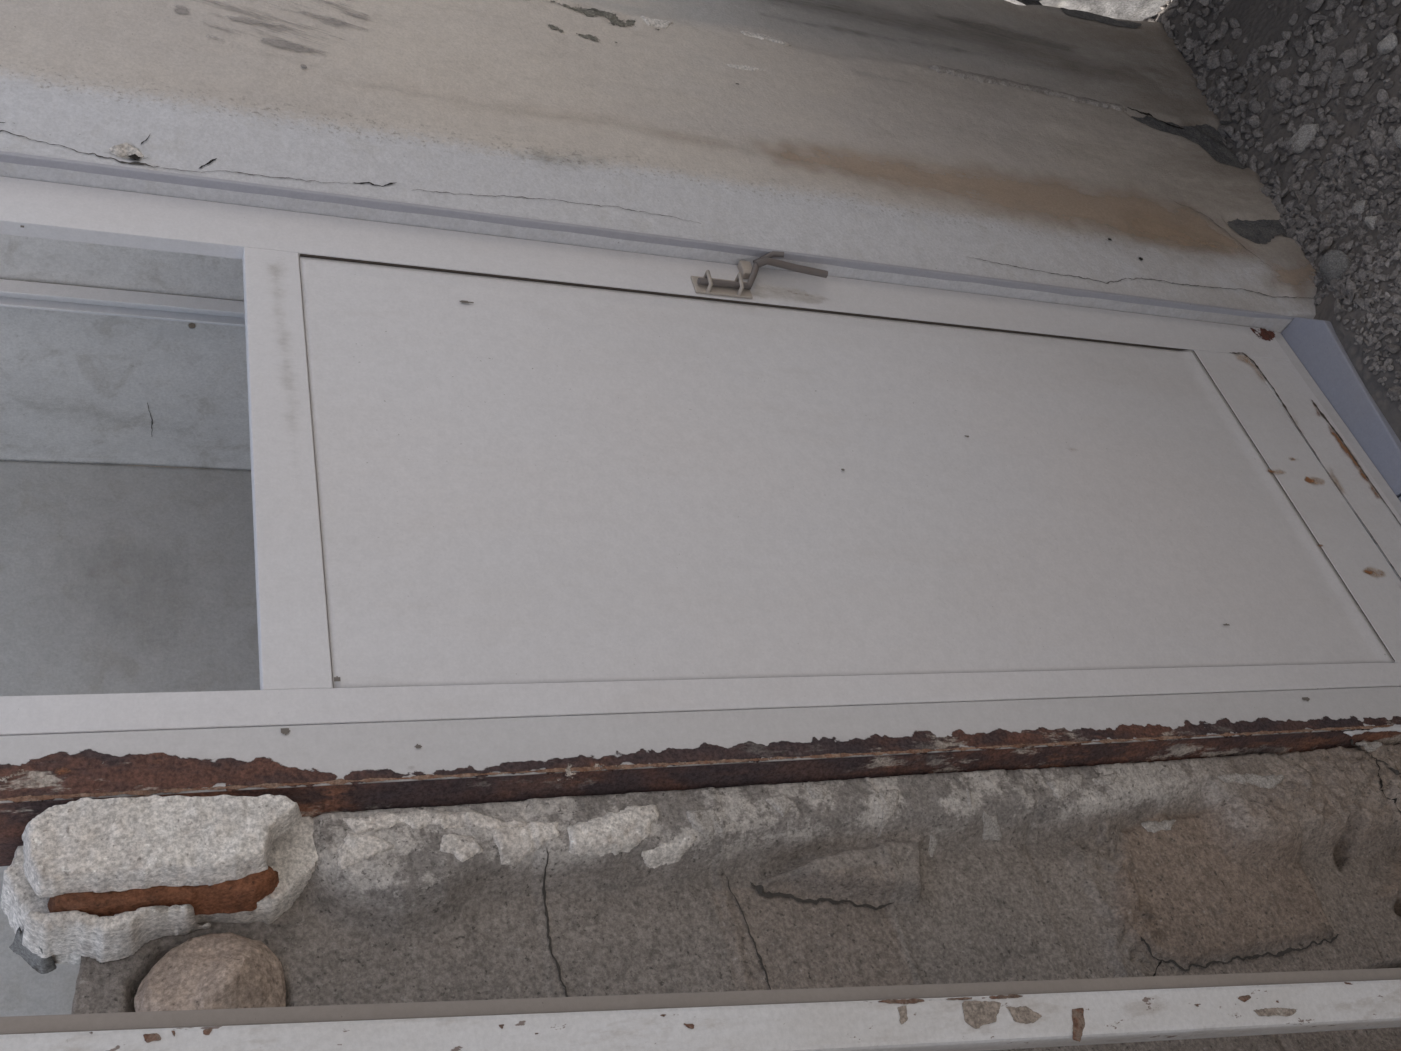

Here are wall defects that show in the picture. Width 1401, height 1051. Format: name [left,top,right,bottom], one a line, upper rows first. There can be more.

spalling [548,0,673,43]
spalling [1128,107,1246,169]
crack [0,122,699,223]
spalling [1227,218,1287,245]
crack [975,258,1308,298]
rust [1250,328,1275,341]
rust [1229,352,1401,579]
rust [0,716,1401,866]